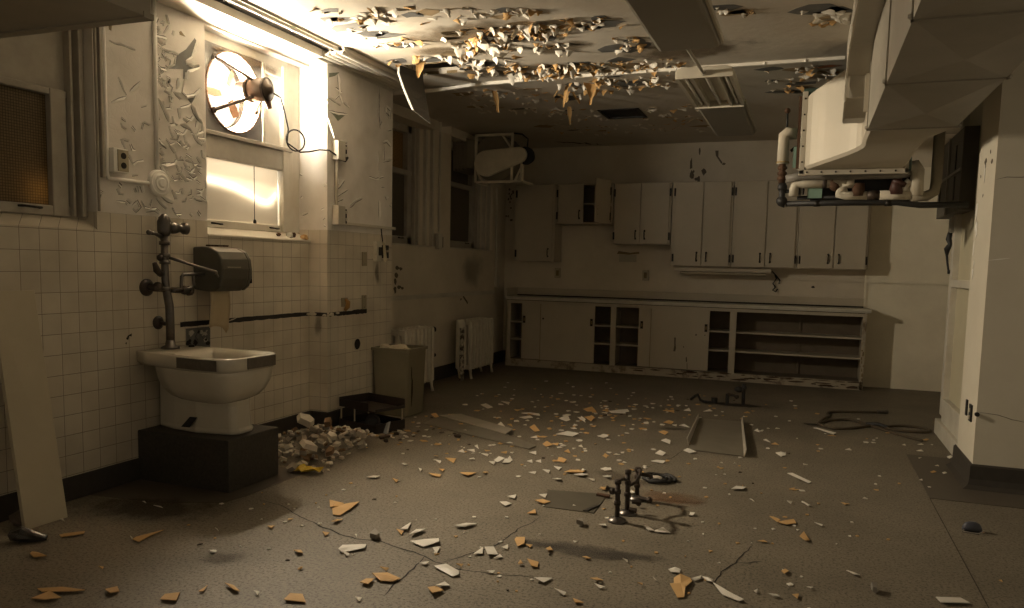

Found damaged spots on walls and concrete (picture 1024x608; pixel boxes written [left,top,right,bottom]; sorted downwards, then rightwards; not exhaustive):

peeling [787,3,853,28]
spalling [116,15,207,217]
peeling [309,7,689,125]
peeling [755,65,841,94]
crack [257,499,558,596]
crack [712,547,759,584]